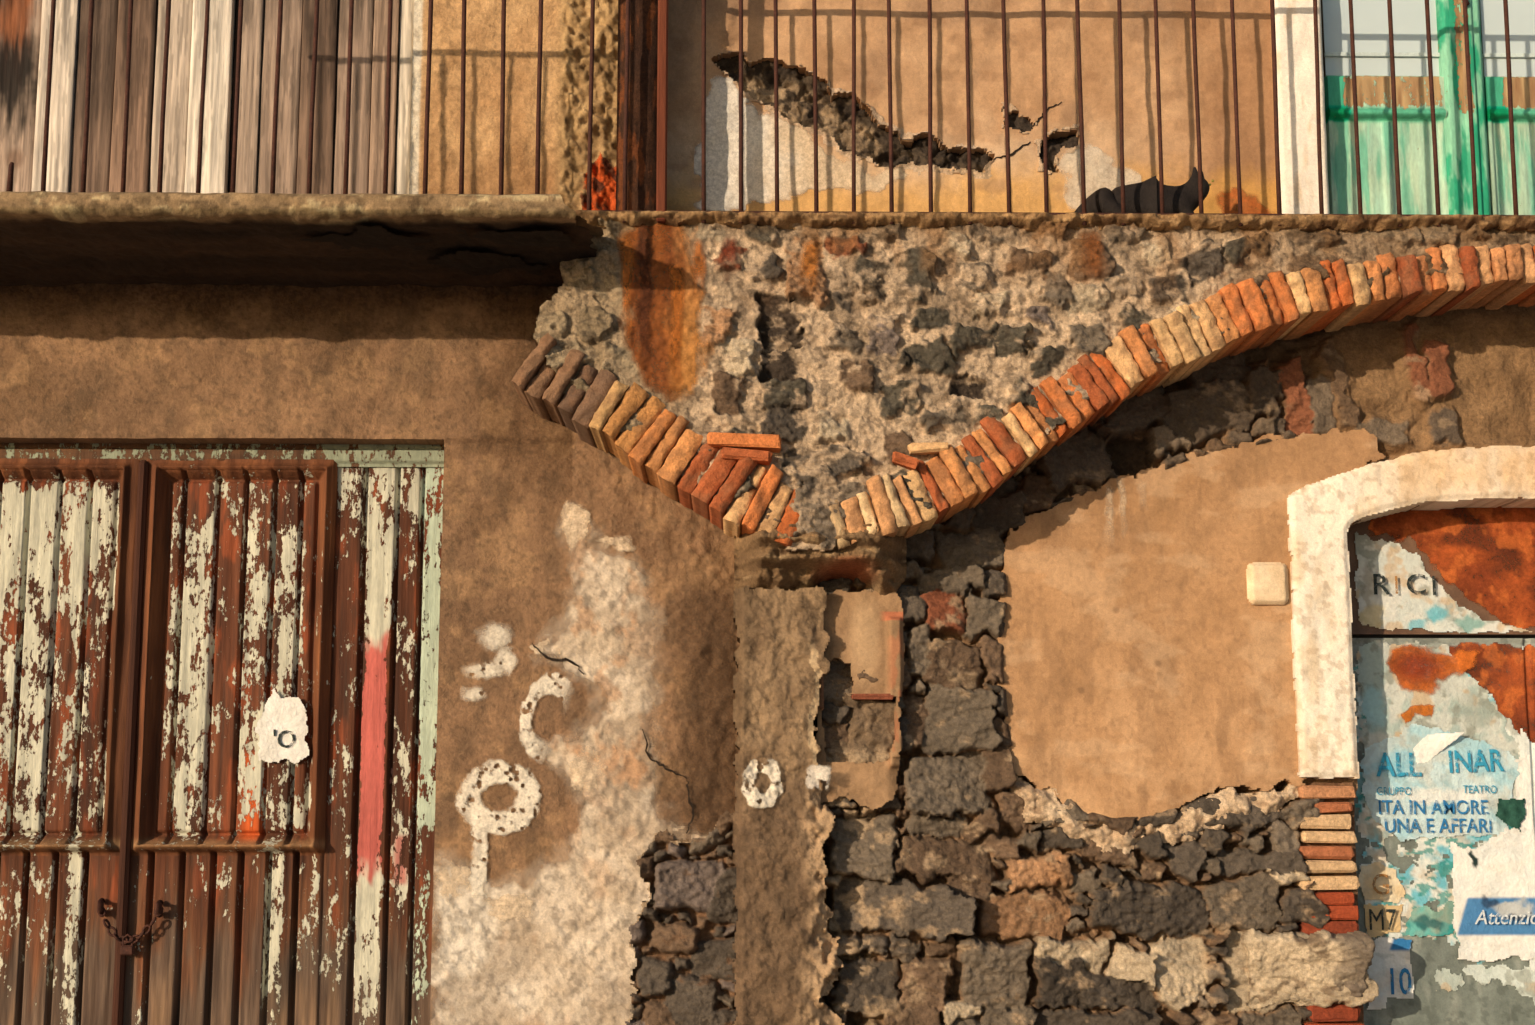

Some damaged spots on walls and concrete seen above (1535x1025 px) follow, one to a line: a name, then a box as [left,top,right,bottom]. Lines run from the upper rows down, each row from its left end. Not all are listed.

peeling [694,51,994,211]
peeling [1001,102,1141,209]
corrosion [618,223,709,397]
corrosion [724,240,735,260]
corrosion [1368,506,1535,743]
flaking render [431,503,738,1025]
crack [642,729,694,834]
flaking render [1009,776,1299,854]